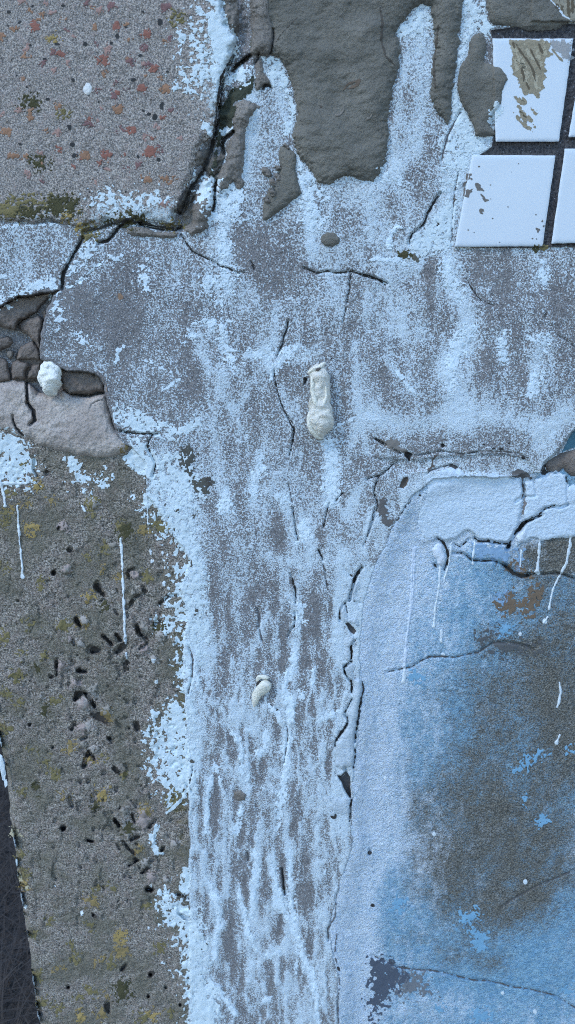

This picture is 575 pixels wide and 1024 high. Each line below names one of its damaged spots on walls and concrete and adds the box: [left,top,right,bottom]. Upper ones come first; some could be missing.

crack [61,29,274,289]
peeling [453,166,493,219]
spalling [0,293,53,382]
spalling [61,370,107,395]
water stain [180,215,307,381]
crack [307,269,388,321]
water stain [211,446,314,554]
crack [288,450,573,619]
water stain [229,599,316,836]
crack [335,640,364,768]
water stain [235,848,323,1024]
water stain [361,951,441,1024]